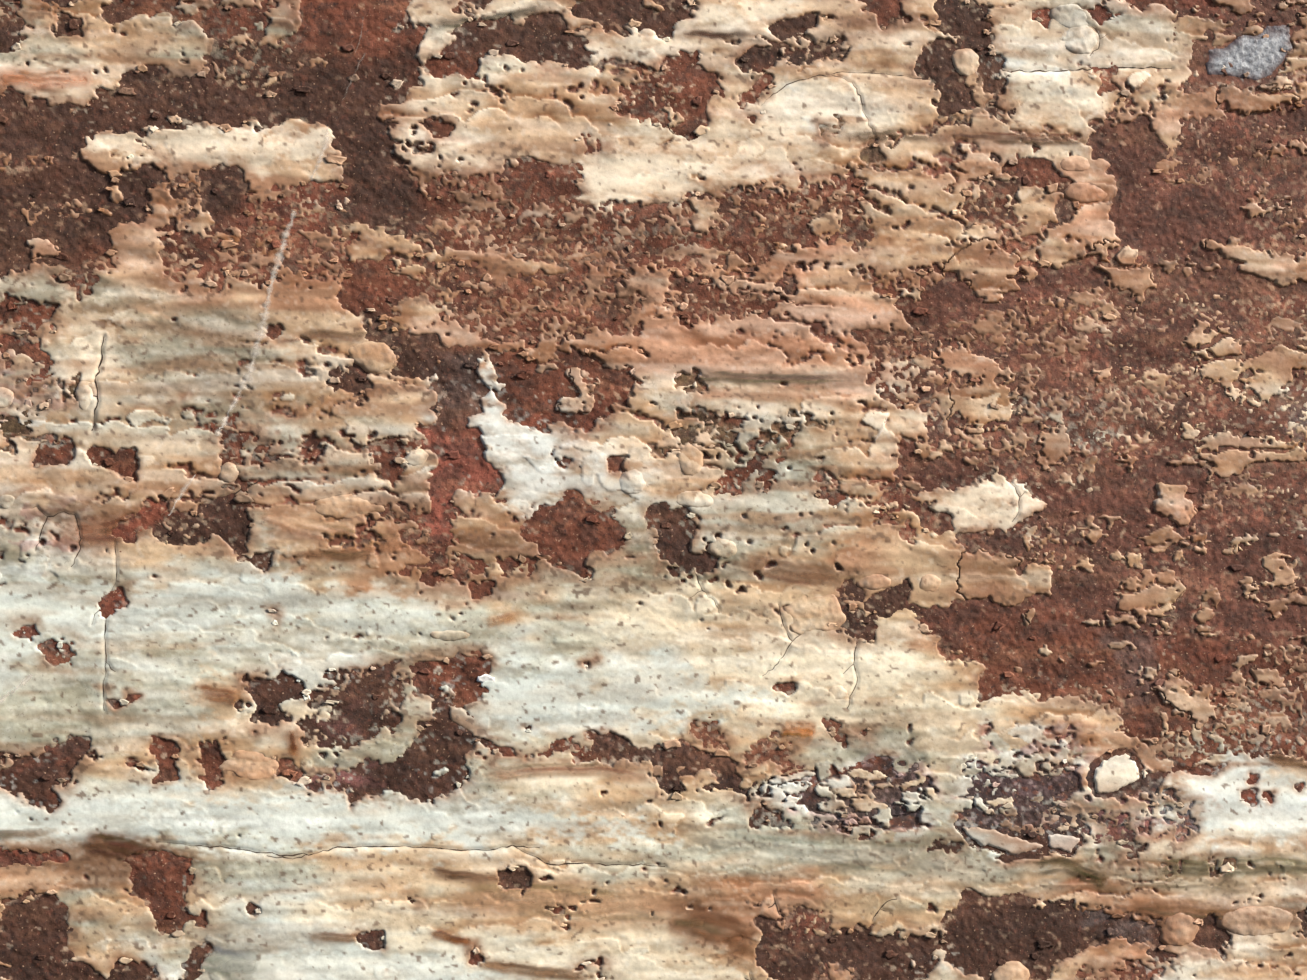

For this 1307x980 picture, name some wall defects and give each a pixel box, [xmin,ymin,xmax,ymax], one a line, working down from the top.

rust [0,0,895,605]
rust [750,0,1307,870]
crack [763,606,800,676]
crack [843,645,858,709]
rust [125,735,180,784]
rust [197,737,227,791]
rust [204,651,931,840]
rust [0,846,70,867]
rust [0,889,158,980]
rust [85,833,213,980]
rust [671,888,1233,980]